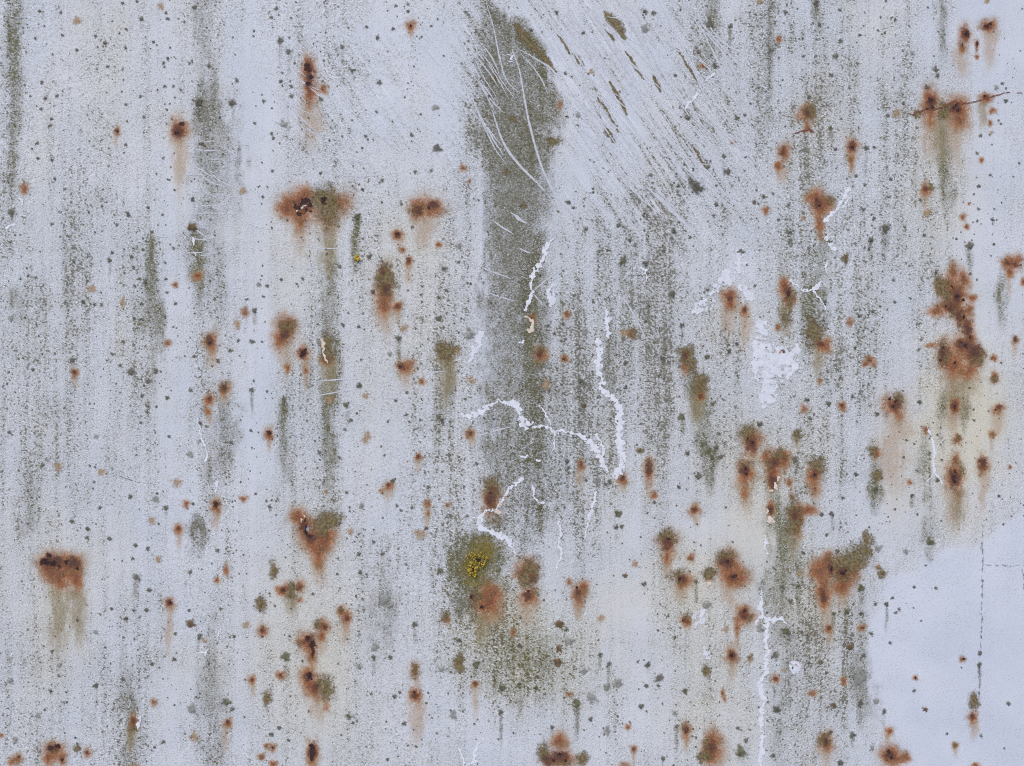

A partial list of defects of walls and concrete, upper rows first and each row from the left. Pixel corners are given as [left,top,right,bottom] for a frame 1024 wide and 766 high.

rust [913,87,997,145]
rust [276,182,351,260]
rust [801,188,835,240]
rust [375,260,402,317]
rust [926,261,998,414]
rust [737,424,826,549]
rust [35,552,84,633]
rust [289,509,354,569]
rust [656,527,751,589]
rust [797,530,886,608]
rust [296,606,352,710]
rust [537,732,589,766]